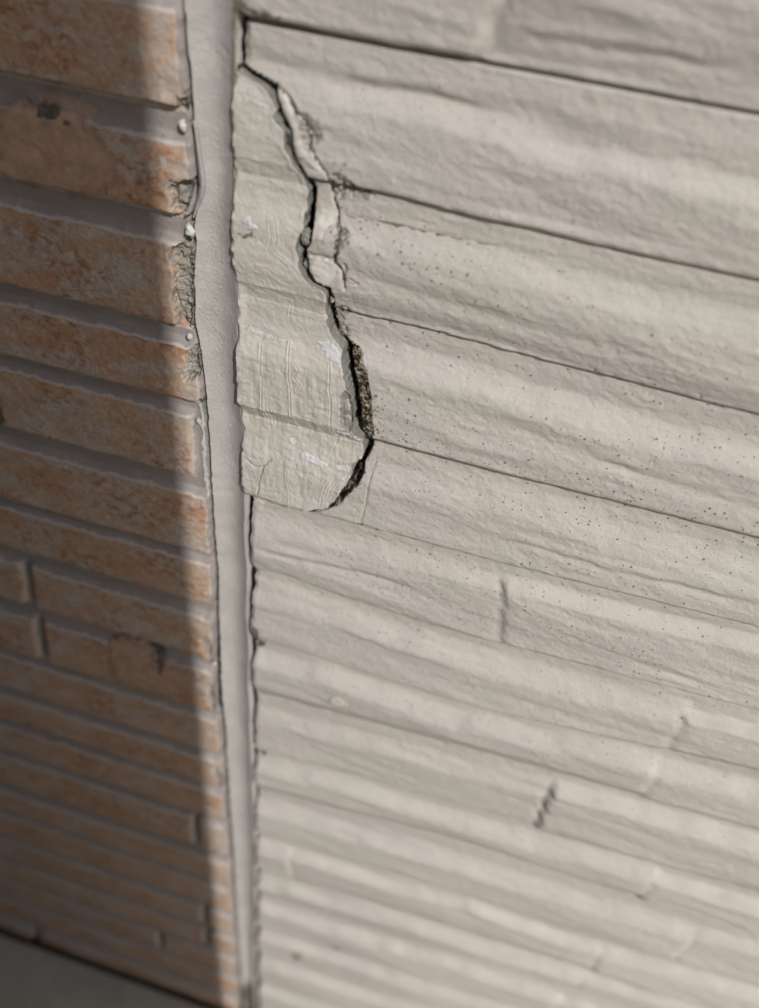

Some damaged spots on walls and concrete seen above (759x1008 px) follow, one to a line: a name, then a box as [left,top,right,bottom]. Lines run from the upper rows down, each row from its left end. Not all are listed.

crack [238,15,495,512]